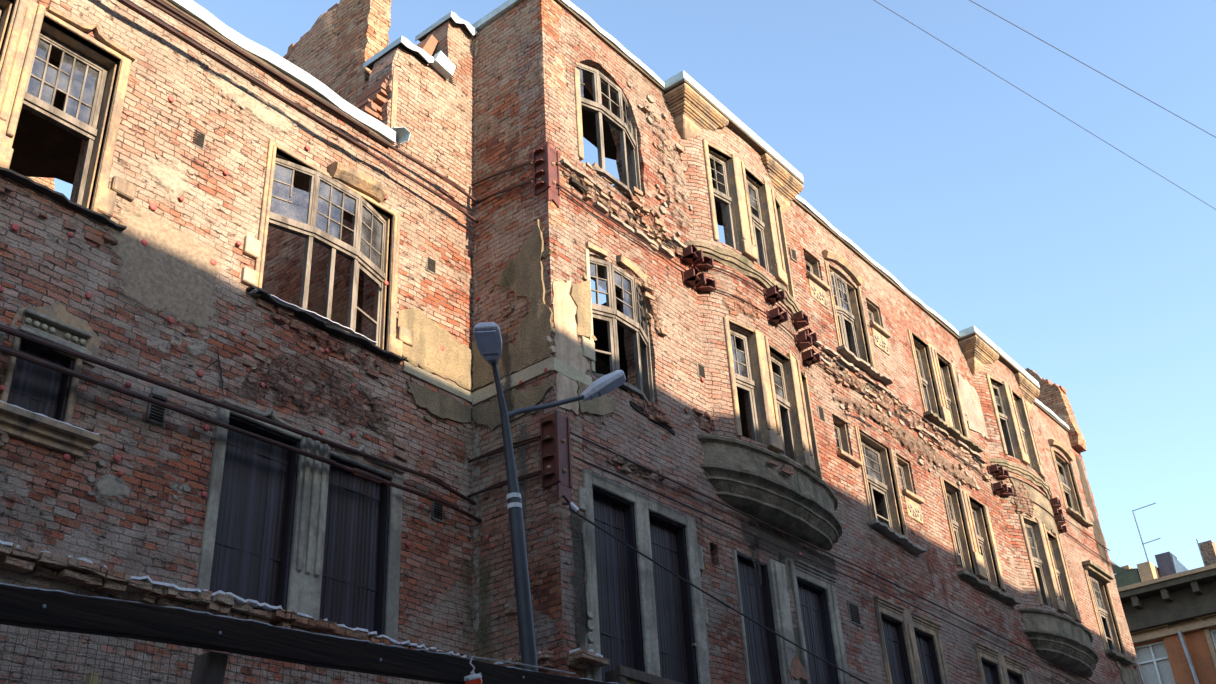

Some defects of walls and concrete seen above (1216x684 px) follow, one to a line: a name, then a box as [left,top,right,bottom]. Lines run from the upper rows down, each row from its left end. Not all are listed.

spalling [563,162,687,253]
spalling [257,299,393,378]
flaking render [396,219,675,435]
spalling [683,408,715,433]